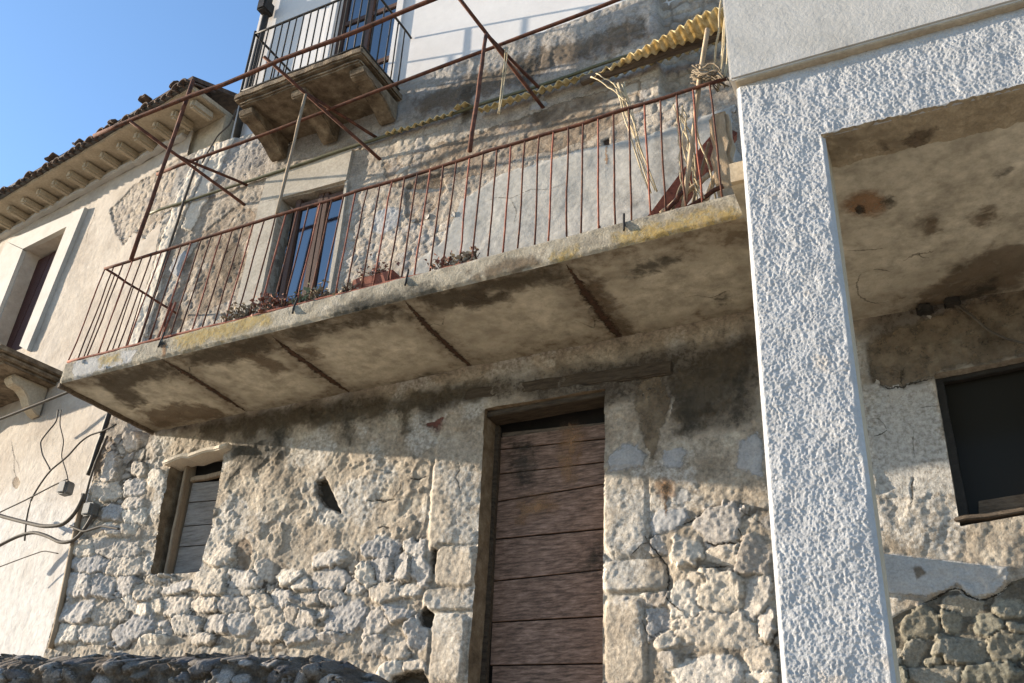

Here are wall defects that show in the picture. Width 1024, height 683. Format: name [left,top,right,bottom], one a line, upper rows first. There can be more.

flaking render [382,80,737,276]
spalling [72,136,256,380]
damp [290,258,566,357]
crack [405,301,472,366]
crack [567,266,622,338]
damp [99,361,477,486]
rust [660,481,671,514]